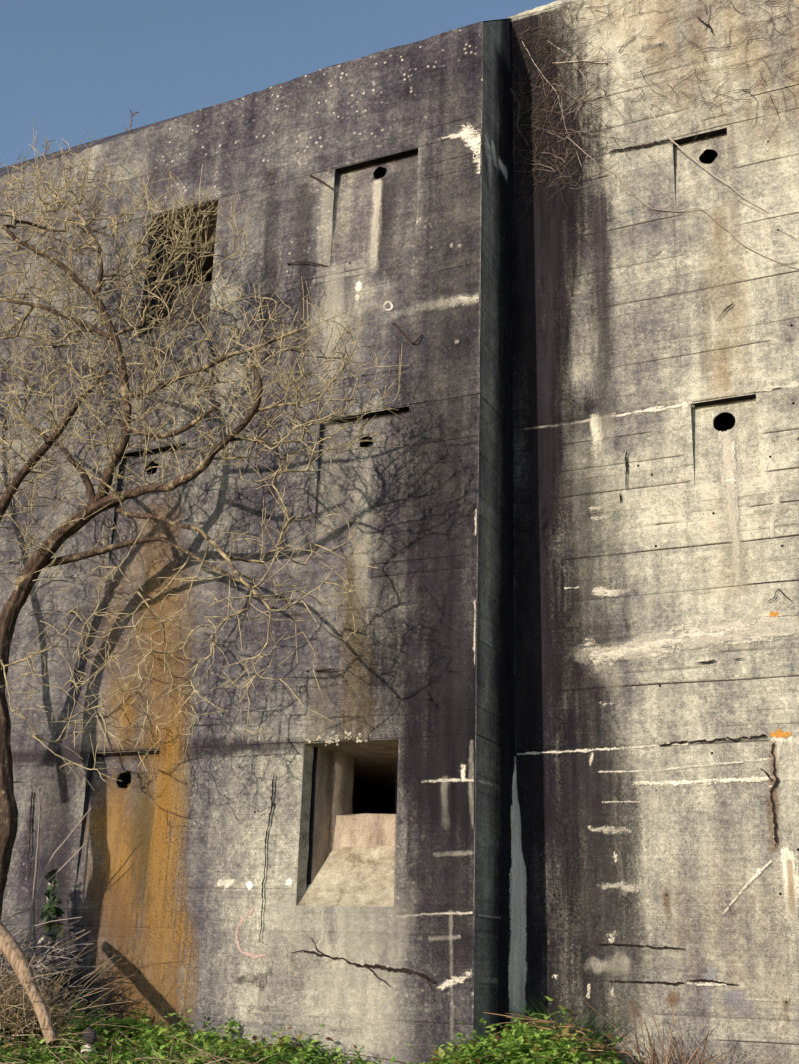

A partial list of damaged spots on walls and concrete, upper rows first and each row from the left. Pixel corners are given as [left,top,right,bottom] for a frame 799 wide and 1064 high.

spalling [443,123,508,180]
leakage [356,9,799,1038]
corrosion [88,682,197,1029]
crack [259,776,274,941]
crack [760,743,799,851]
crack [292,937,436,1002]